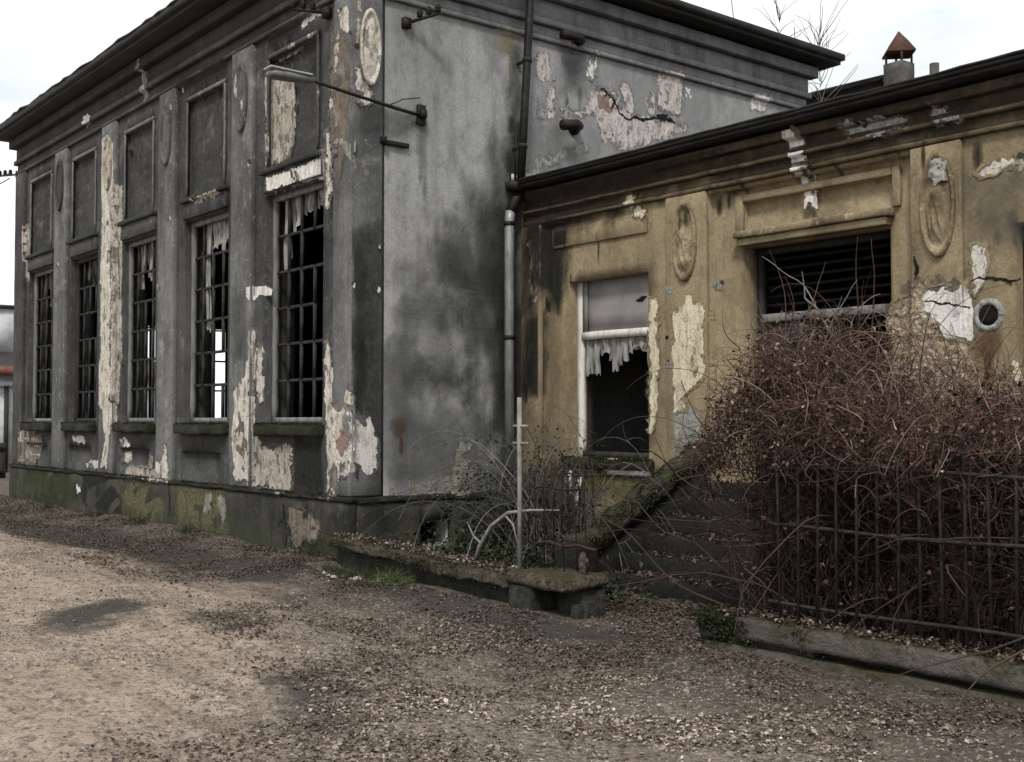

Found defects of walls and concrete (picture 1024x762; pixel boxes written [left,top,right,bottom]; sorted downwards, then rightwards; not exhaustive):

peeling [263,0,375,209]
peeling [533,49,692,151]
crack [596,87,675,124]
peeling [780,125,819,210]
leakage [82,474,124,515]
peeling [86,136,170,484]
peeling [230,327,321,549]
peeling [323,339,382,498]
leakage [521,150,712,401]
peeling [646,294,716,452]
spalling [882,241,991,401]
crack [913,256,1021,339]